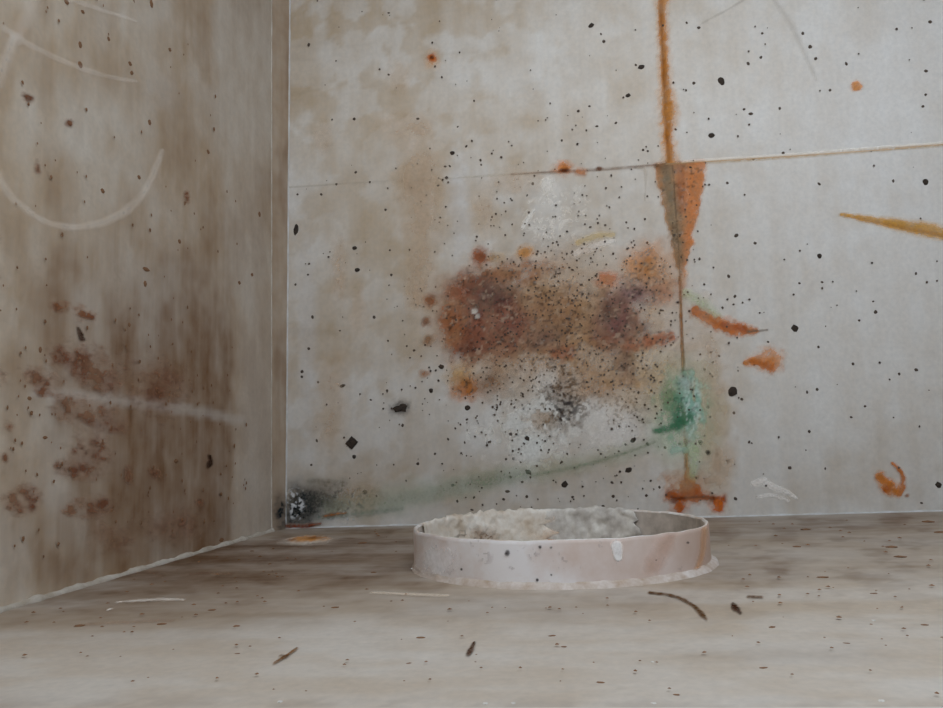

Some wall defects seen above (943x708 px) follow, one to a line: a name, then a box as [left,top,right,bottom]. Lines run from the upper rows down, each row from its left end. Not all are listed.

corrosion [423,0,768,396]
corrosion [840,213,943,239]
corrosion [26,371,50,395]
corrosion [54,346,121,391]
corrosion [744,349,780,372]
corrosion [61,396,118,432]
water stain [654,370,706,452]
corrosion [55,440,107,478]
corrosion [665,434,726,513]
corrosion [875,462,908,496]
water stain [276,481,386,528]